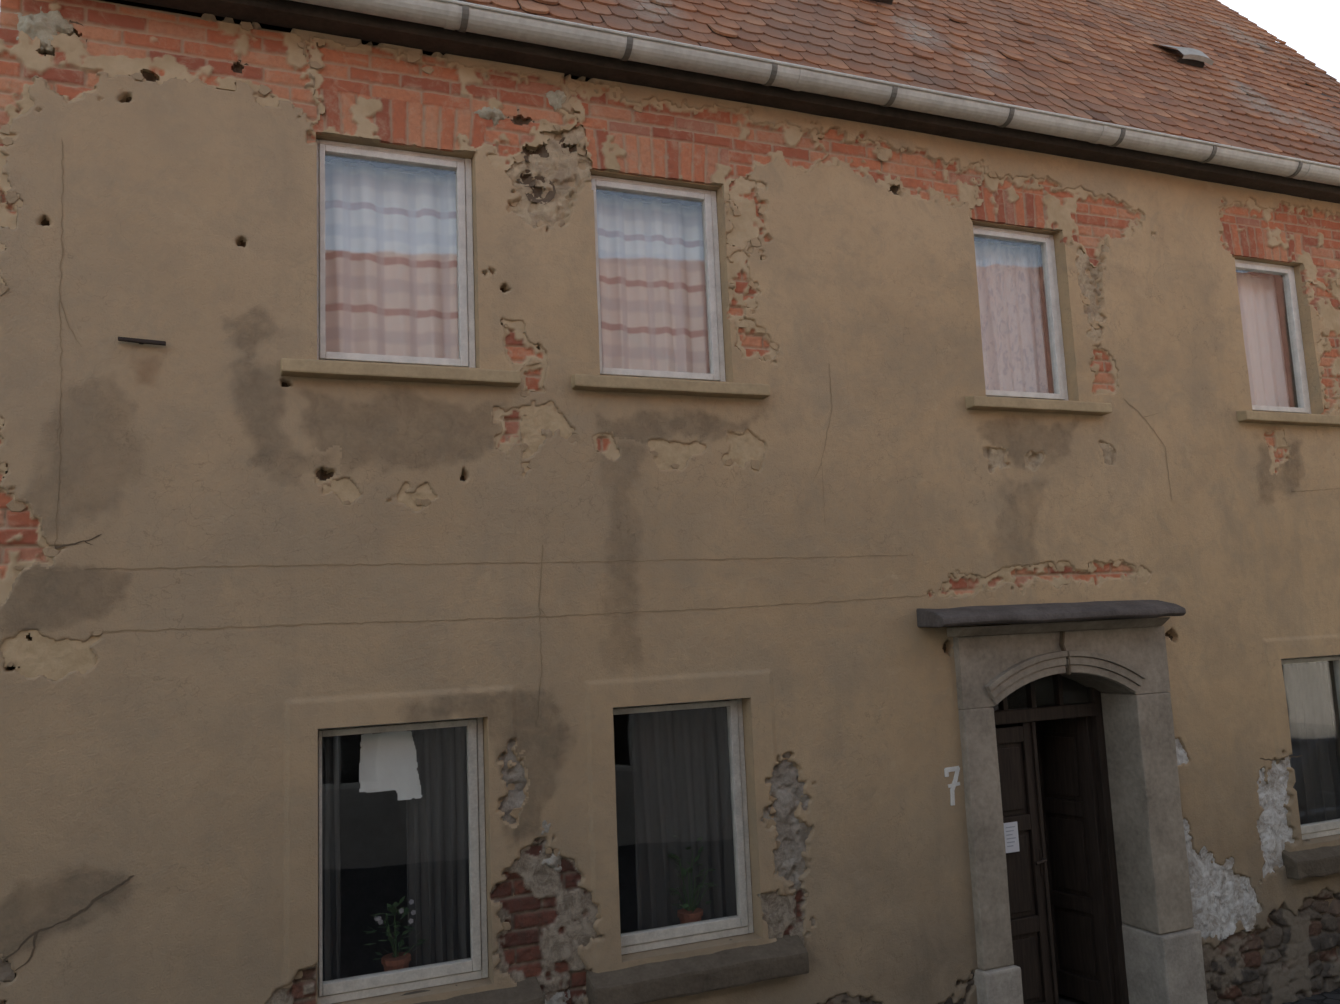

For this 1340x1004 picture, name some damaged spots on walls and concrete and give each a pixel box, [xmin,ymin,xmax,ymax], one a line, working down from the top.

spalling [0,0,1154,365]
spalling [1218,198,1340,415]
crack [53,139,925,724]
peeling [493,318,620,477]
spalling [0,463,65,604]
peeling [0,629,102,680]
crack [2,875,134,971]
spalling [266,965,316,1004]
spalling [490,836,603,1004]
spalling [758,752,815,945]
flaking render [824,993,882,1004]
flaking render [1183,756,1340,1004]